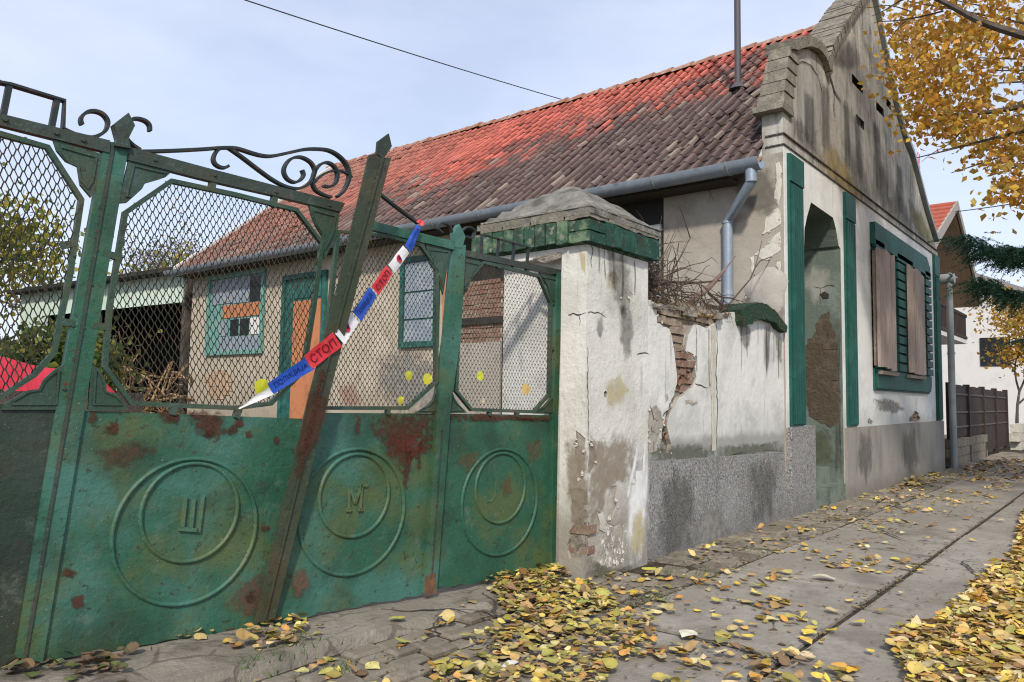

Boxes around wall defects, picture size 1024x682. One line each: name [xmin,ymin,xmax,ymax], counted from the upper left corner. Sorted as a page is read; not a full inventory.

peeling [750,162,783,278]
damp [608,251,633,352]
corrosion [297,369,327,476]
peeling [574,432,597,481]
spalling [648,302,717,454]
spalling [805,291,841,427]
peeling [569,485,627,574]